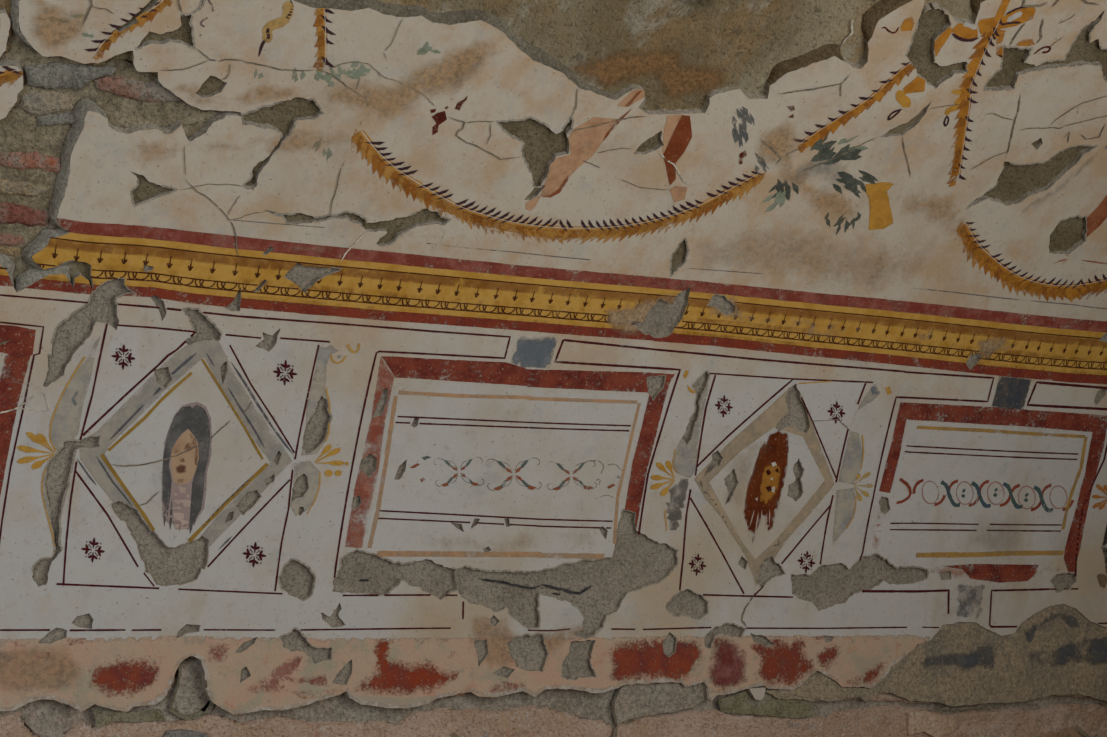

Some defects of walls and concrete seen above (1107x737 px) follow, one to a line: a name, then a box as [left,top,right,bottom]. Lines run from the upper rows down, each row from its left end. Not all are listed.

crack [81,0,114,27]
crack [159,17,519,160]
flaking render [905,5,968,85]
flaking render [982,21,1107,91]
flaking render [0,28,225,287]
crack [179,145,266,257]
crack [330,163,344,215]
flaking render [496,114,574,199]
crack [569,89,687,190]
flaking render [966,145,1098,210]
flaking render [31,435,101,585]
peeling [0,500,1107,737]